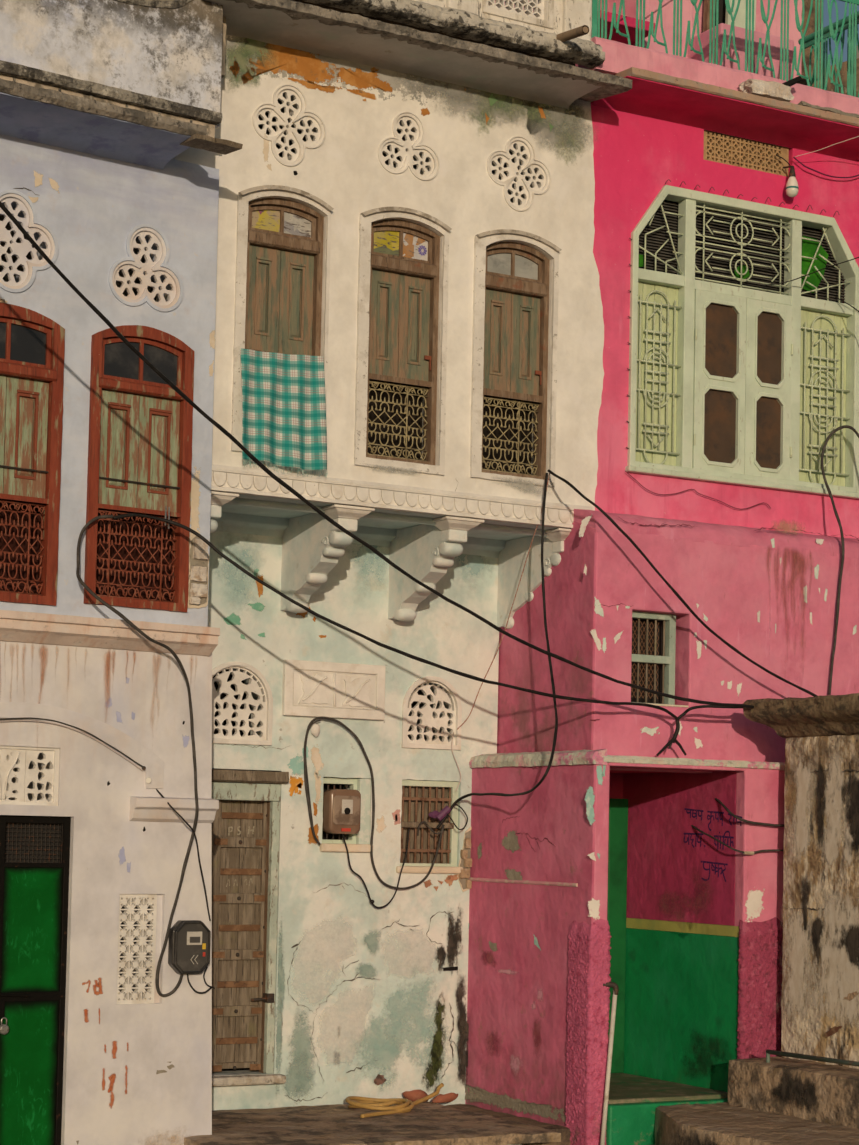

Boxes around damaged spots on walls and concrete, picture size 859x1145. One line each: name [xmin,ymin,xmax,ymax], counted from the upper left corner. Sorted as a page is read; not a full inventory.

peeling [224,35,448,116]
peeling [579,516,592,537]
peeling [594,597,630,617]
peeling [589,629,624,653]
peeling [585,765,606,825]
damp [792,757,859,865]
crack [383,911,452,944]
damp [436,913,462,970]
peeling [588,898,600,920]
damp [783,878,859,1028]
crack [279,941,376,1102]
damp [361,978,469,1087]